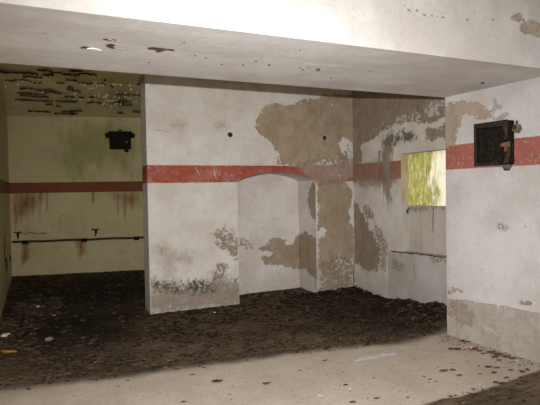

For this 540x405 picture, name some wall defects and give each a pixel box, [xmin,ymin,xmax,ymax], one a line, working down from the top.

peeling [513,13,540,37]
spalling [81,39,122,53]
peeling [0,69,141,115]
peeling [214,90,493,291]
leakage [151,276,239,312]